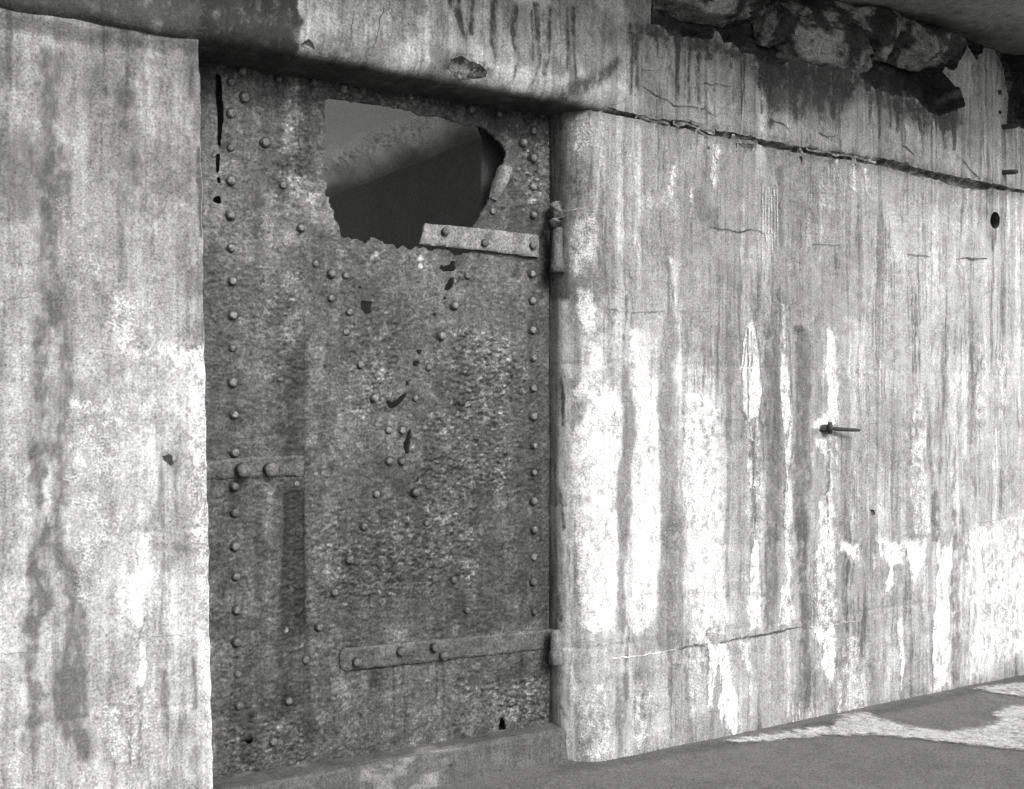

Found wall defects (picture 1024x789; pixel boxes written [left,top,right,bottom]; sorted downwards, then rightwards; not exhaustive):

damp [0,0,304,96]
spalling [446,56,487,80]
spalling [651,5,792,67]
damp [549,7,962,166]
crack [610,55,1024,193]
spalling [847,39,1024,129]
damp [4,50,169,789]
damp [110,291,213,789]
damp [567,215,753,735]
damp [764,320,1024,722]
crack [610,621,856,659]
damp [563,676,661,762]